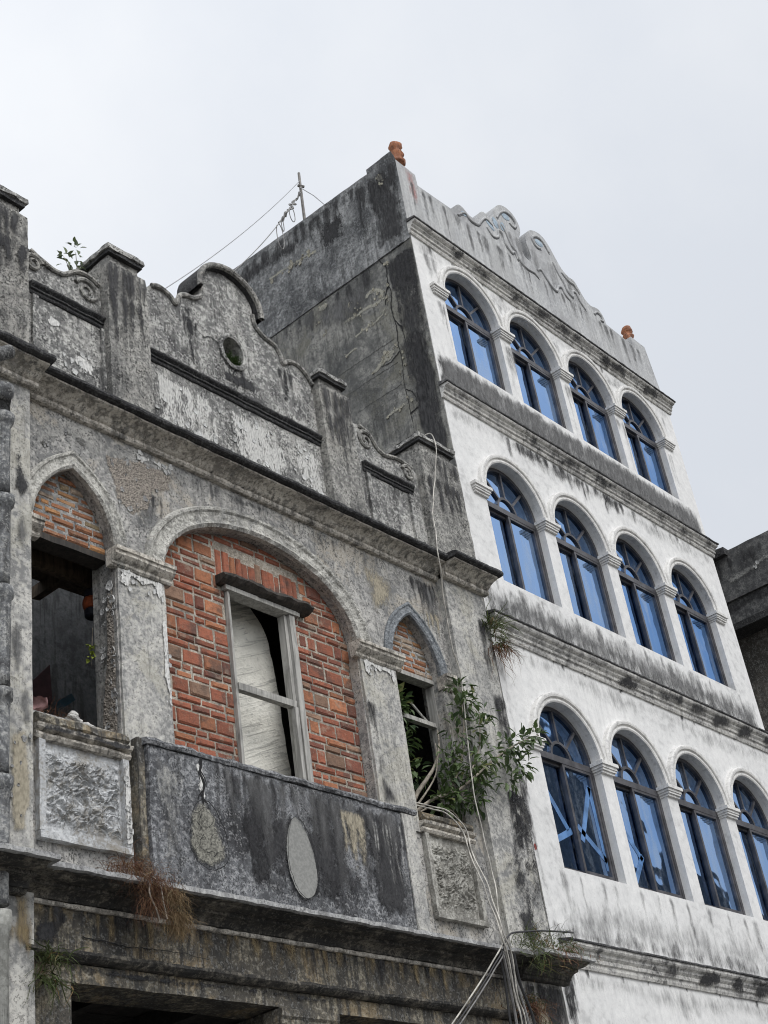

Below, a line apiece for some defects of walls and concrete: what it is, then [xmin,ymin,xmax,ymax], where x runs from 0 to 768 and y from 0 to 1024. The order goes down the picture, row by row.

damp [177,164,401,325]
damp [443,207,538,275]
damp [15,454,29,493]
spalling [106,449,173,515]
peeling [155,373,325,495]
damp [278,368,292,400]
crack [270,242,418,433]
damp [388,247,701,539]
crack [190,757,229,871]
damp [217,764,409,916]
damp [36,906,65,943]
damp [691,930,745,998]